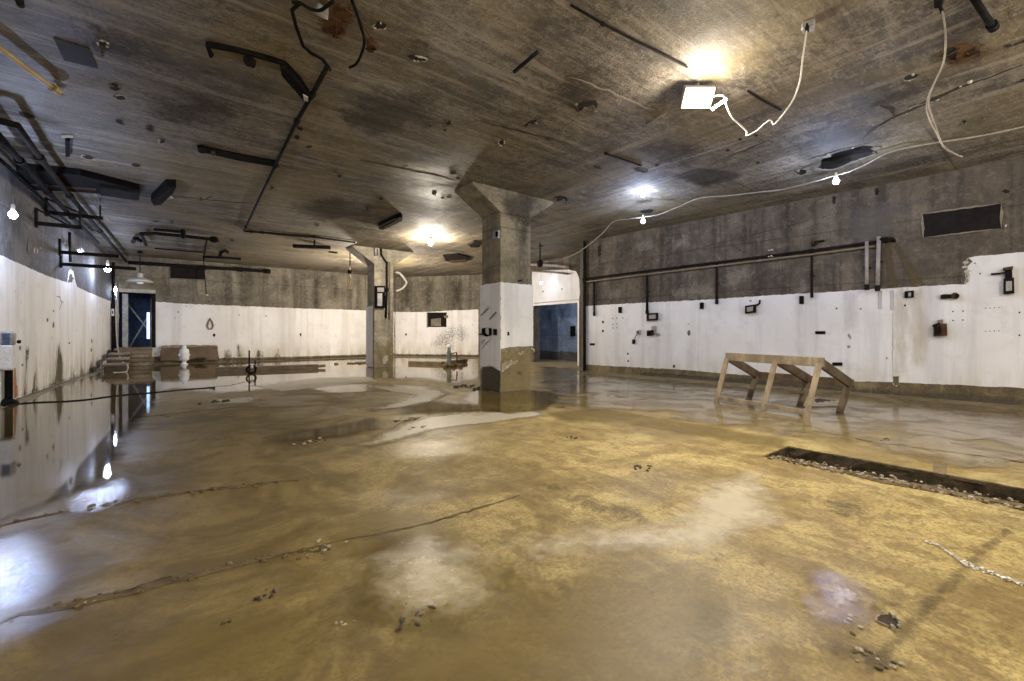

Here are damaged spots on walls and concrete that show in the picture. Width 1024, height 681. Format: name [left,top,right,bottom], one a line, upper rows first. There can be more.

peeling [962,258,973,284]
crack [0,480,298,528]
crack [0,494,520,624]